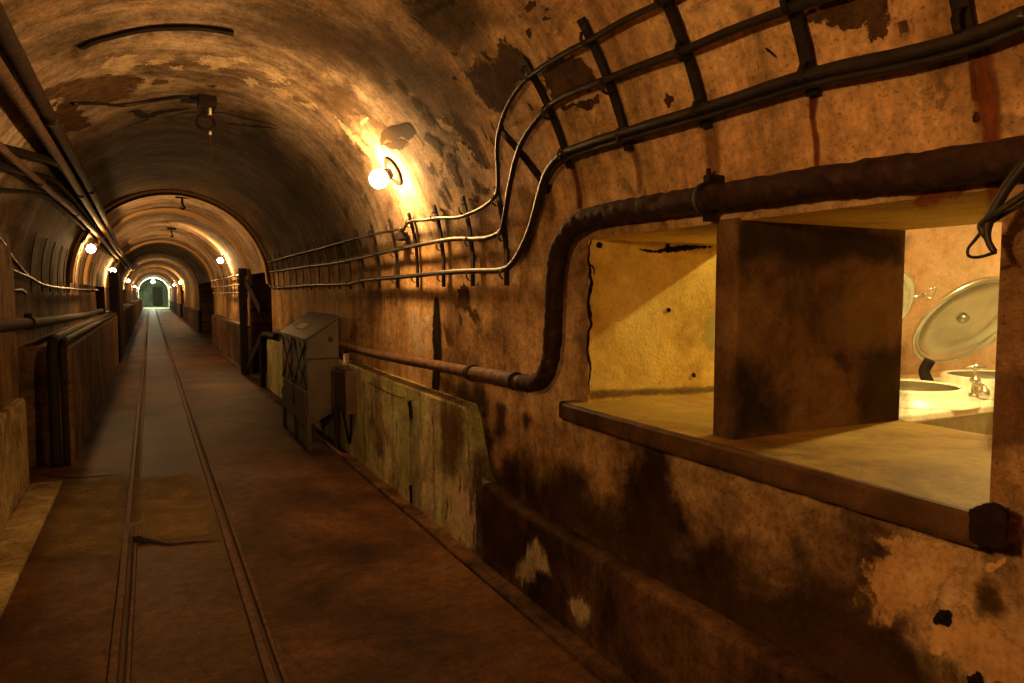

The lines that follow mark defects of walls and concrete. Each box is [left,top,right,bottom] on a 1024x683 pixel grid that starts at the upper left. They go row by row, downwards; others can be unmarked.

spalling [518,0,551,21]
spalling [804,0,907,43]
spalling [44,52,322,133]
spalling [333,35,528,218]
spalling [540,55,600,111]
corrosion [704,127,719,175]
corrosion [809,95,819,166]
corrosion [969,48,1000,143]
peeling [516,539,550,585]
peeling [570,597,590,627]
leakage [439,375,966,683]
peeling [860,502,1024,683]